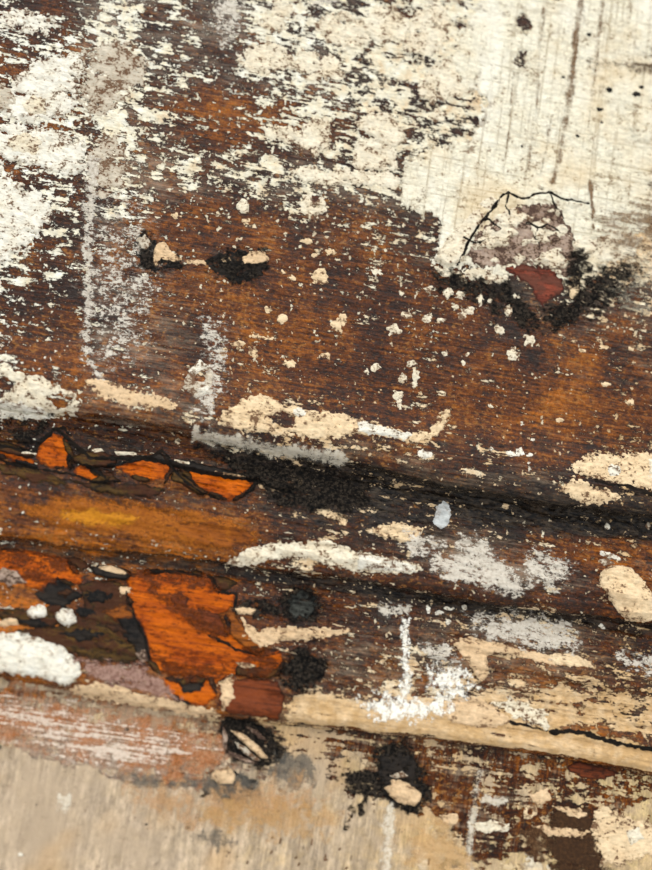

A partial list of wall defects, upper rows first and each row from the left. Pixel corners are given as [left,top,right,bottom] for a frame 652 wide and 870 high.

spalling [128,229,270,285]
crack [456,191,590,266]
peeling [431,196,643,299]
peeling [0,399,57,420]
peeling [357,421,412,442]
peeling [0,433,275,502]
crack [0,426,280,500]
crack [594,478,652,496]
peeling [357,552,417,572]
peeling [0,547,350,806]
crack [508,720,652,752]
peeling [528,788,590,839]